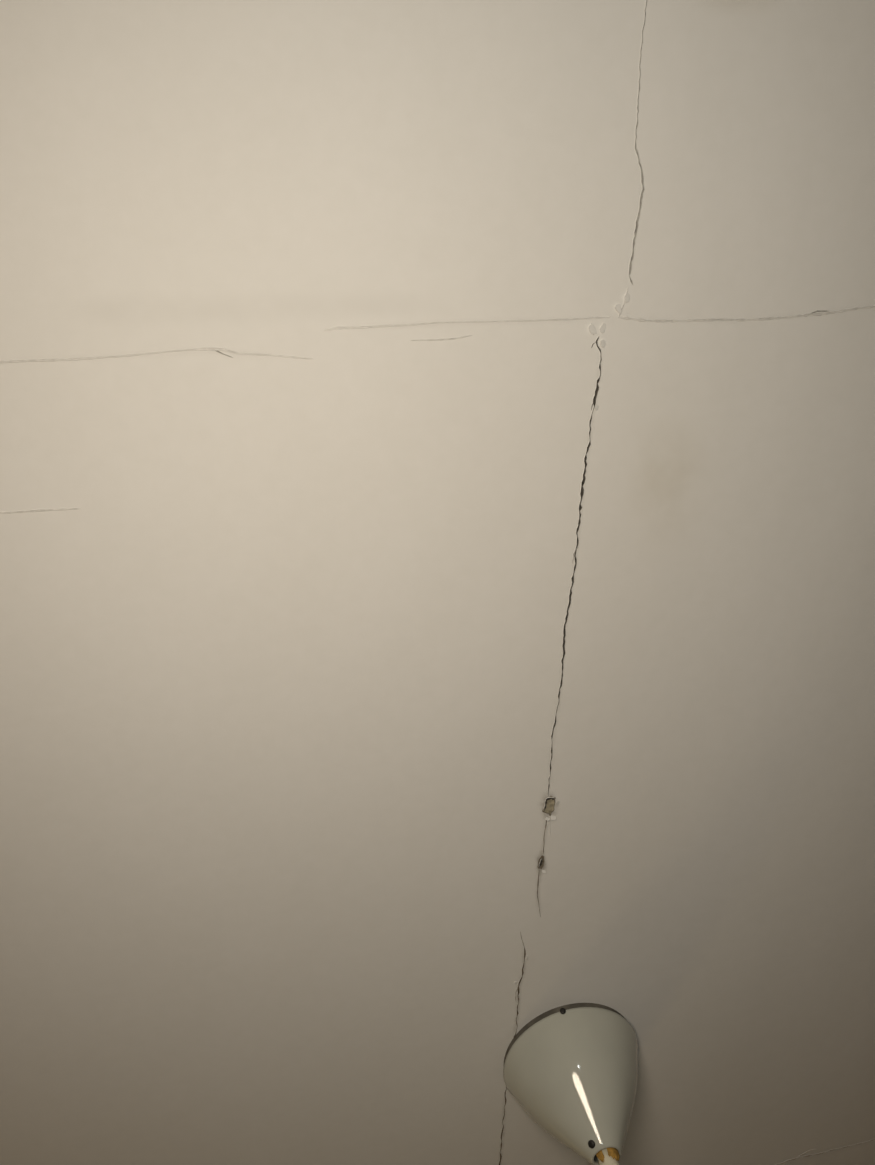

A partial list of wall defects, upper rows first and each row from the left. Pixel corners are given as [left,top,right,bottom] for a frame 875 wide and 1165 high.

crack [0,347,313,364]
crack [324,0,875,1038]
crack [498,1085,507,1165]